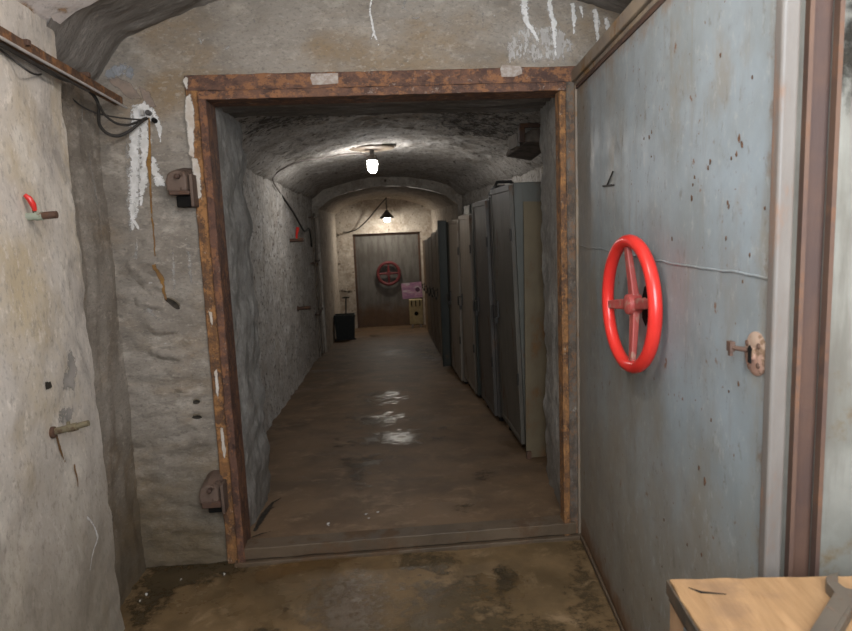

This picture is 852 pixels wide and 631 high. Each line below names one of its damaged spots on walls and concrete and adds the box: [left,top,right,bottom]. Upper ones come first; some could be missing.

leakage [507,0,611,63]
leakage [126,101,165,232]
rust [146,118,167,301]